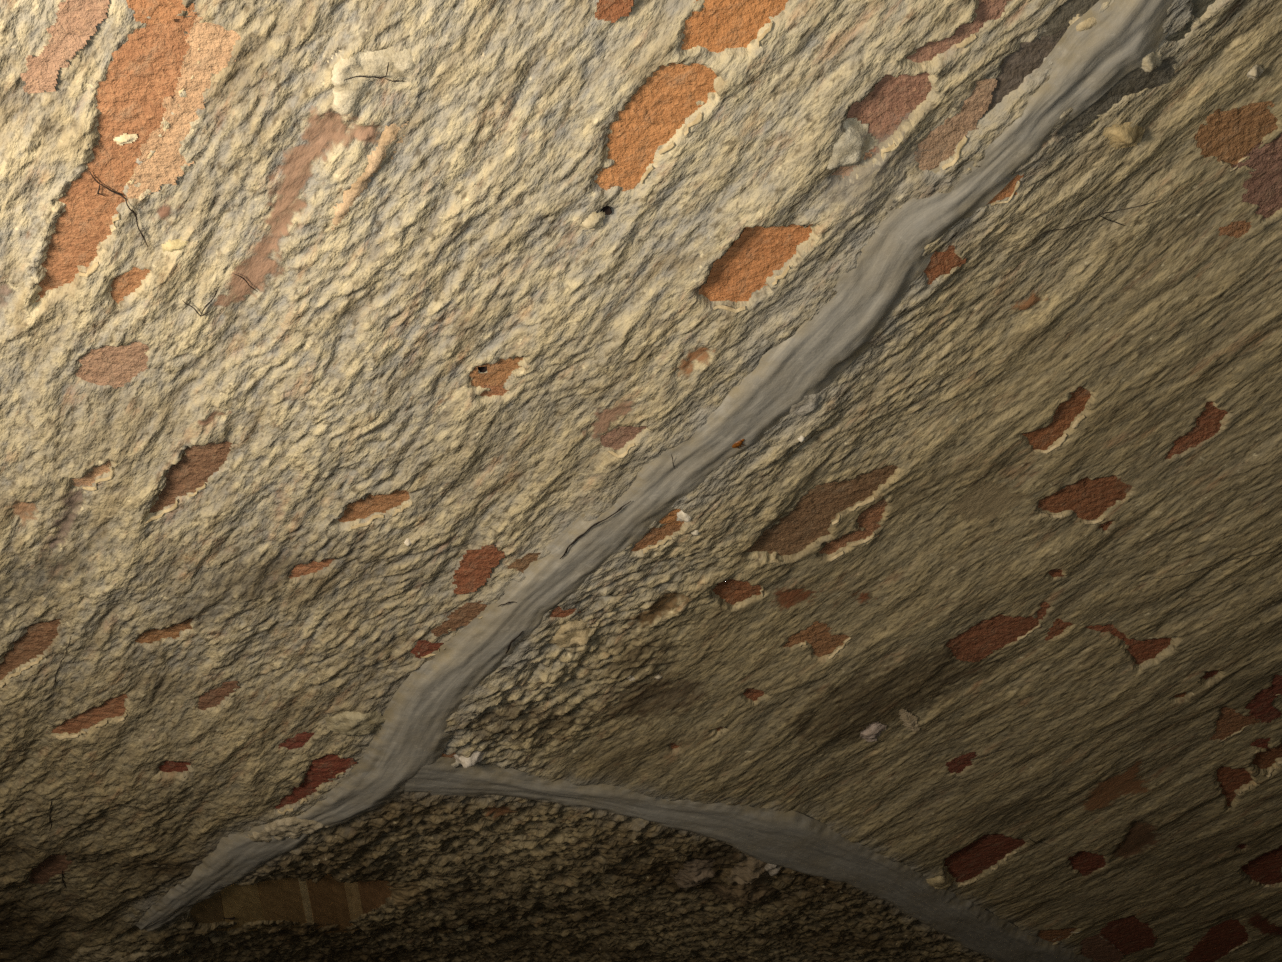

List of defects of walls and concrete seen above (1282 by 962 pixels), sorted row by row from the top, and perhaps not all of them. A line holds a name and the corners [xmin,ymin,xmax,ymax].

flaking render [20,0,110,94]
flaking render [594,0,788,191]
flaking render [827,0,1012,178]
flaking render [36,0,241,304]
flaking render [1193,101,1282,238]
flaking render [699,224,813,313]
flaking render [144,441,233,525]
crack [560,501,631,559]
flaking render [747,465,898,565]
flaking render [1038,475,1132,531]
flaking render [946,602,1171,665]
flaking render [926,834,1025,890]